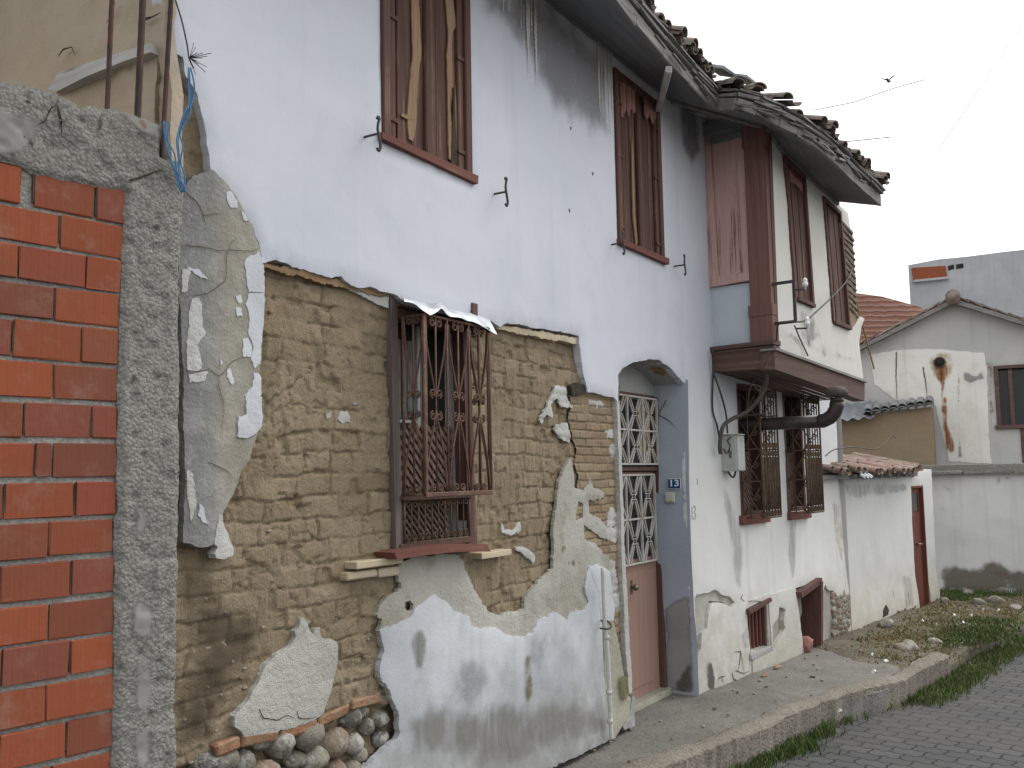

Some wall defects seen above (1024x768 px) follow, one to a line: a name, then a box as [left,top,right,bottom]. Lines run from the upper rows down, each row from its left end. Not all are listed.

leakage [502,0,614,134]
crack [177,191,257,334]
flaking render [173,84,635,768]
rust [936,367,954,451]
crack [174,445,182,529]
flaking render [694,590,732,644]
leakage [943,563,1024,592]
leakage [677,666,692,691]
leakage [417,709,598,757]